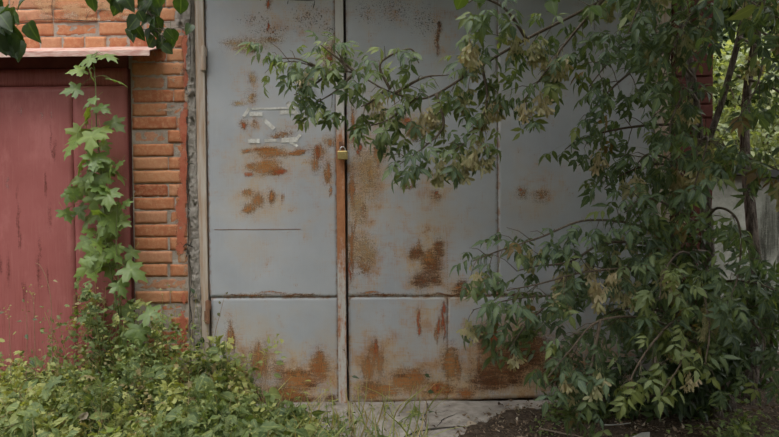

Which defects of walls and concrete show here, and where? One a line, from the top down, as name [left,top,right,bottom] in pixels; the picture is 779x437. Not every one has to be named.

rust [243,140,334,195]
rust [243,190,285,213]
rust [410,239,471,339]
rust [231,344,328,402]
rust [362,328,573,399]